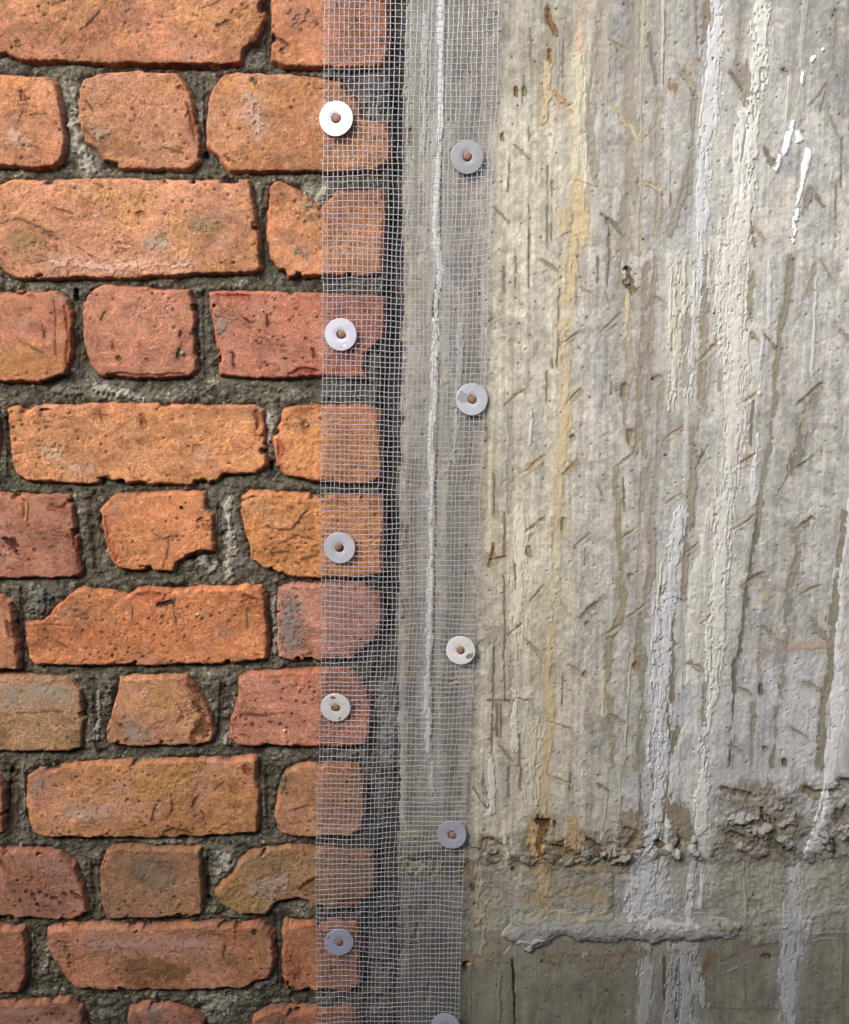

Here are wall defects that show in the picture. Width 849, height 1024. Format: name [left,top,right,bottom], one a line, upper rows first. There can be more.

efflorescence [785,0,809,131]
water stain [801,186,813,215]
water stain [472,0,793,916]
corrosion [524,630,585,917]
spalling [479,834,515,871]
spalling [549,837,602,859]
spalling [615,823,682,852]
spalling [717,786,795,859]
spalling [800,775,849,828]